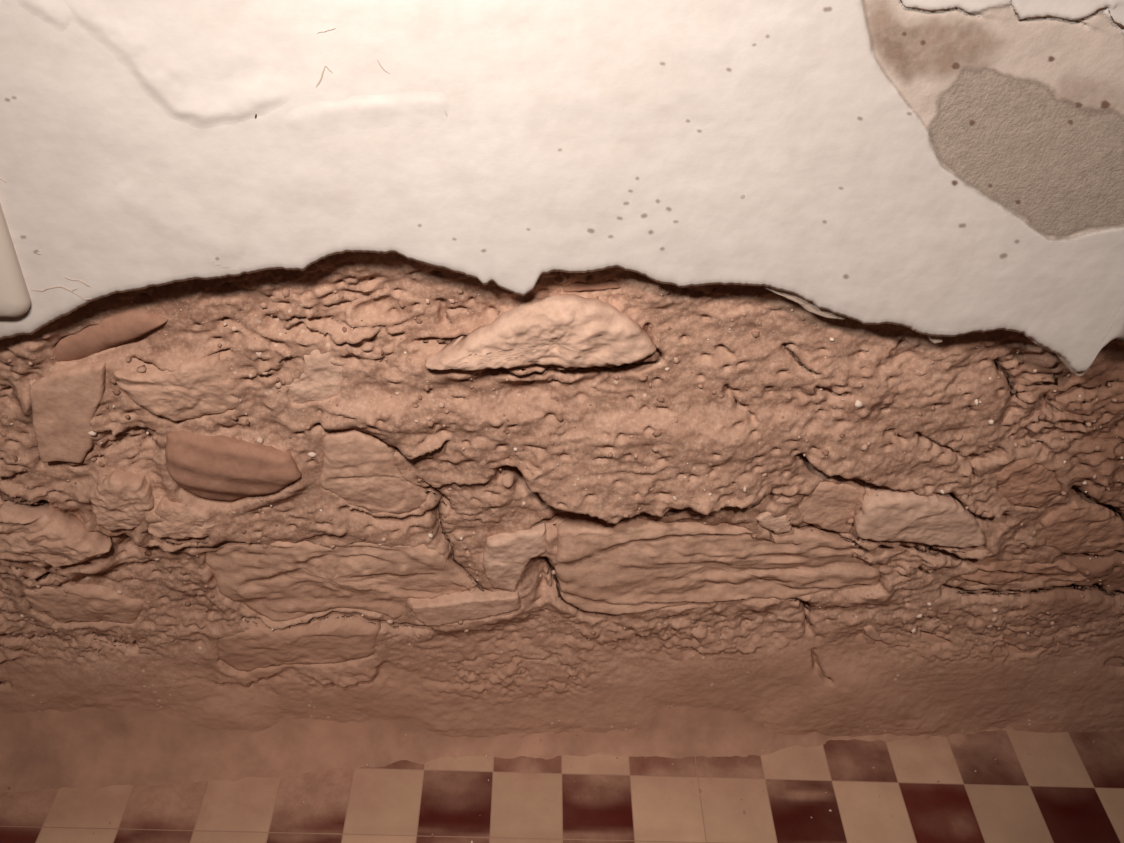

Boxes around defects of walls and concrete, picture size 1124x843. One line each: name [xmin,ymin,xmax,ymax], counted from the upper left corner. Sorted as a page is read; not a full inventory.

crack [900,0,980,17]
peeling [863,0,1124,239]
crack [1011,2,1124,29]
flaking render [0,252,1124,738]